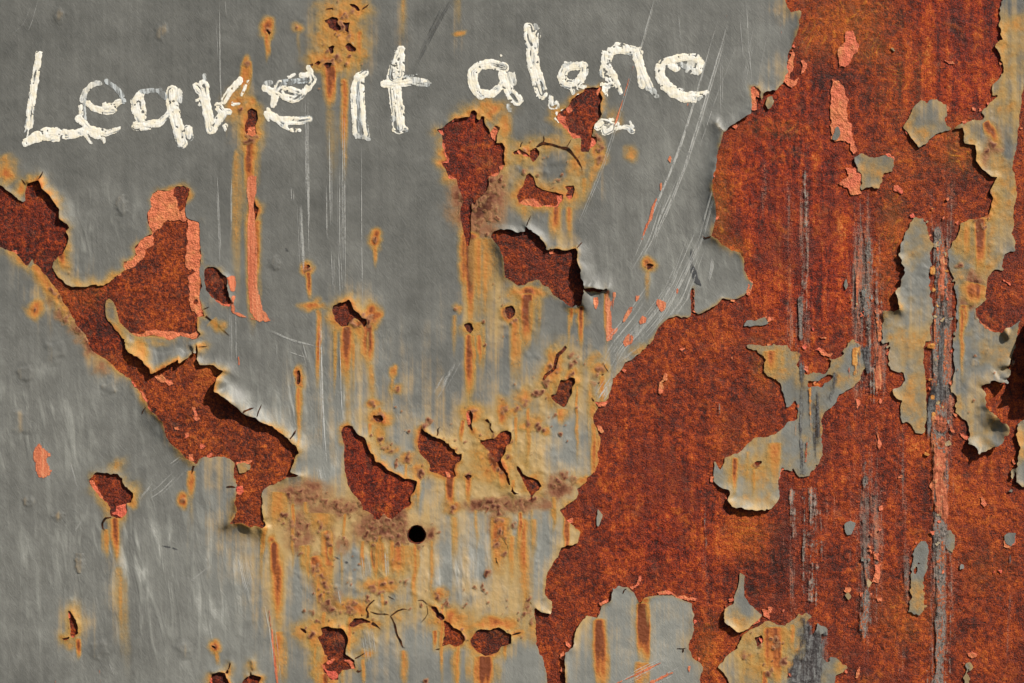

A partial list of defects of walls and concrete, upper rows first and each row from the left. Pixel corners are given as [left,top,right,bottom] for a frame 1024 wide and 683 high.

rust [309,0,369,158]
rust [227,56,262,305]
peeling [434,110,579,246]
rust [551,134,606,195]
peeling [0,171,309,543]
peeling [339,422,476,520]
rust [260,174,610,683]
peeling [485,221,618,315]
peeling [533,0,1024,683]
rust [954,189,1000,370]
peeling [428,602,512,658]
rust [634,597,651,683]